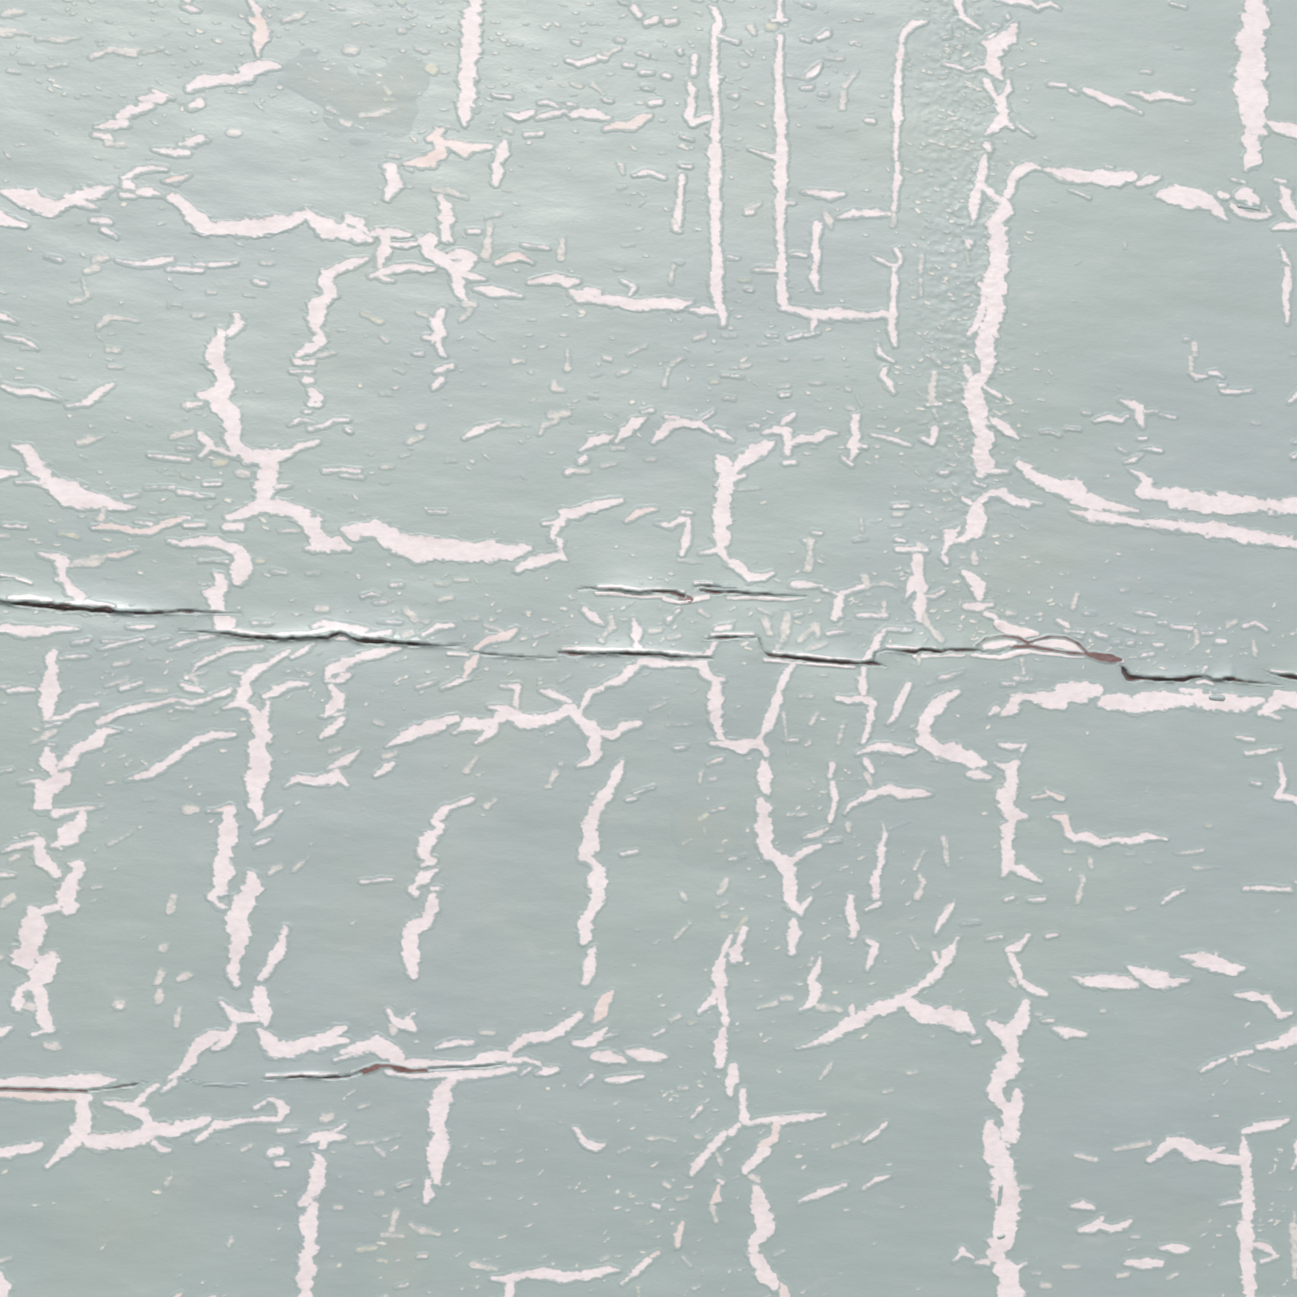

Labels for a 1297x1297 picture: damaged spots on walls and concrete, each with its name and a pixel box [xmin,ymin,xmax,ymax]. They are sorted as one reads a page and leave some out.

peeling [787,186,892,295]
peeling [308,576,551,693]
peeling [974,586,1271,689]
crack [0,188,1052,1297]
crack [831,666,1297,886]
peeling [841,819,911,974]
crack [1239,876,1297,895]
peeling [0,1085,91,1094]
peeling [352,1061,435,1076]
crack [1067,948,1297,1075]
peeling [1067,1198,1193,1283]
crack [1143,1115,1297,1297]